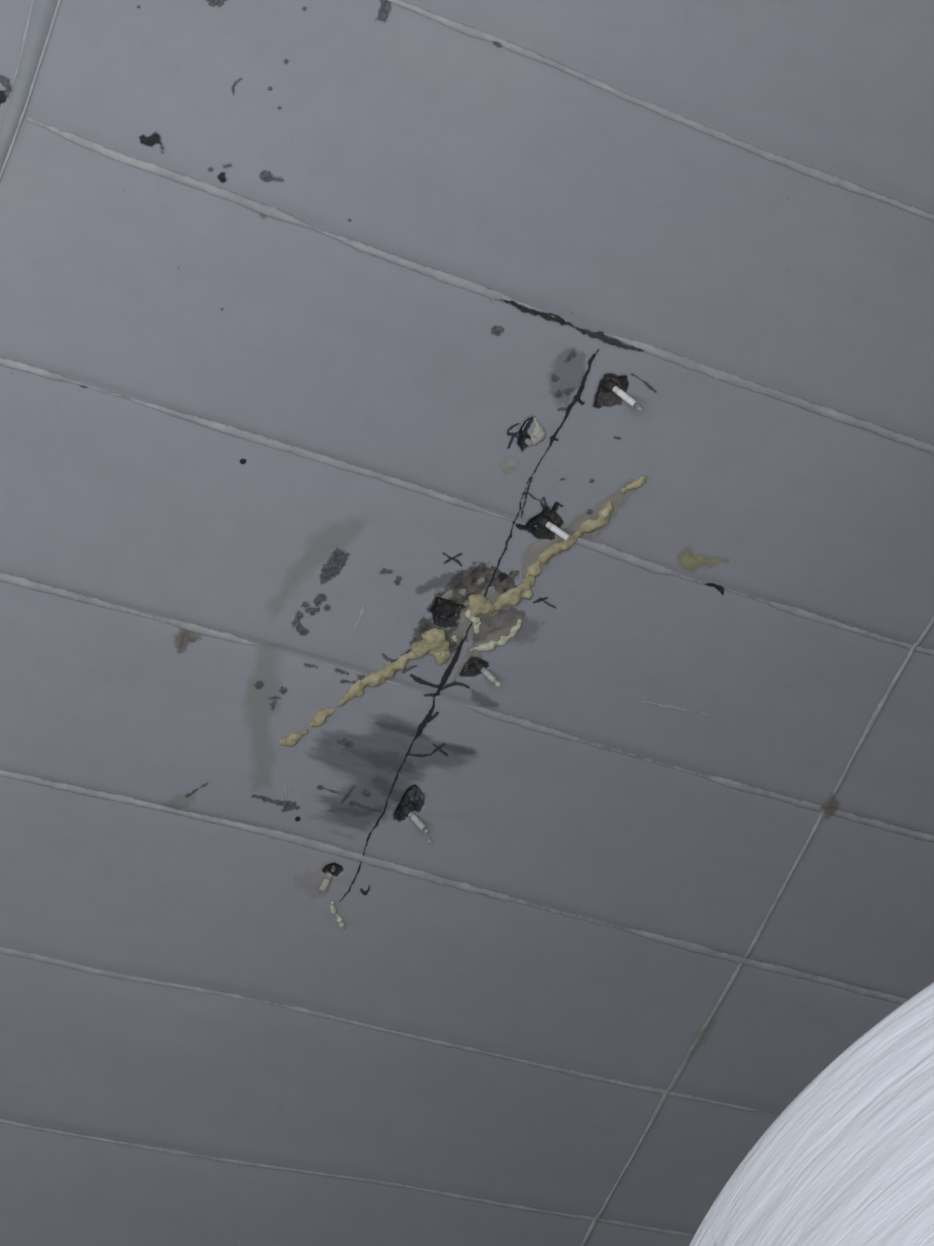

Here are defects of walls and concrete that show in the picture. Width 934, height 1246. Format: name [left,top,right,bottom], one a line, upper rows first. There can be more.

crack [484,299,656,596]
crack [340,623,472,902]